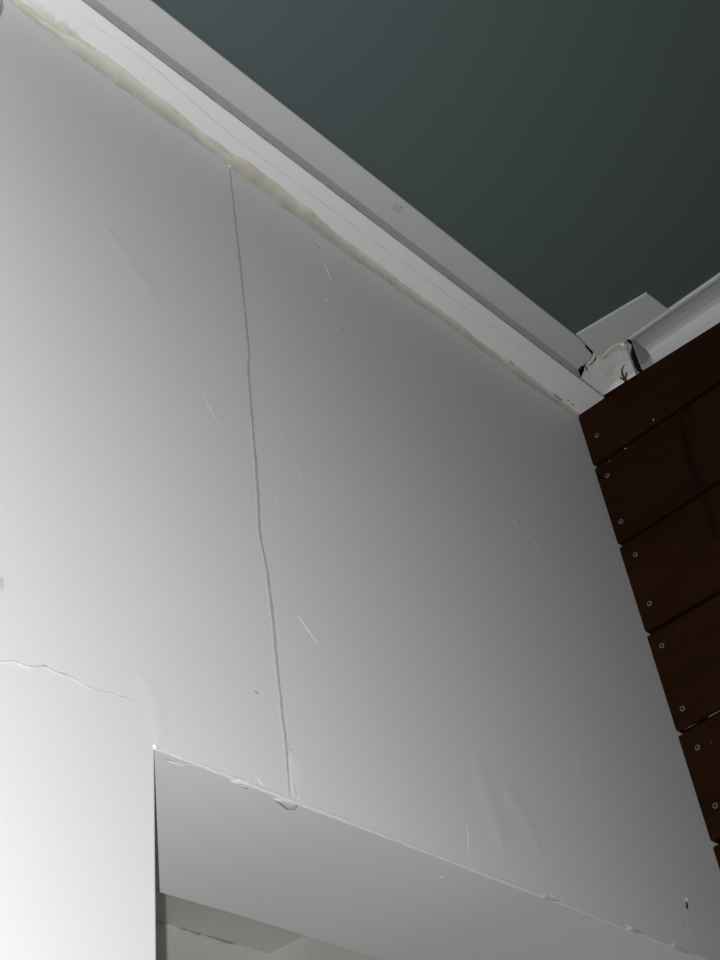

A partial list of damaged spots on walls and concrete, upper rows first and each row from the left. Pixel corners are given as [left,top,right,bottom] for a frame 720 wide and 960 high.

crack [0,0,578,801]
flaking render [581,341,639,395]